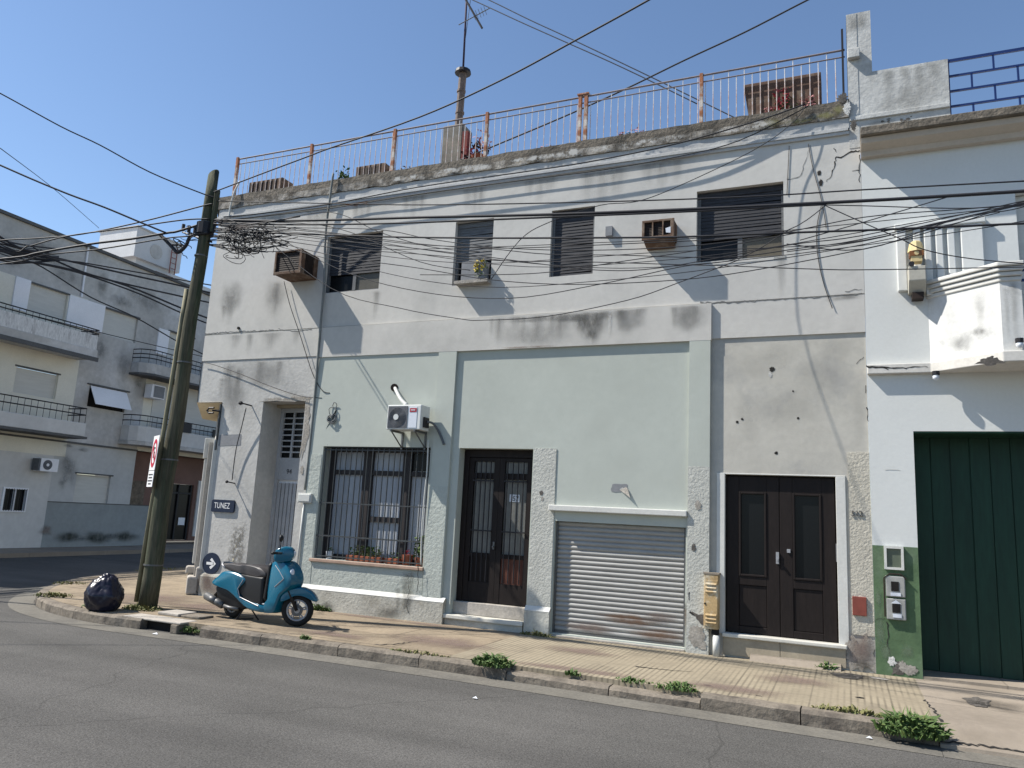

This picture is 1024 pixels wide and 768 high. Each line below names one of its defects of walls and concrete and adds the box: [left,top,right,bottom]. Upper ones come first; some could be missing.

crack [788,146,861,186]
crack [857,357,927,420]
flaking render [688,611,707,650]
flaking render [831,624,919,680]